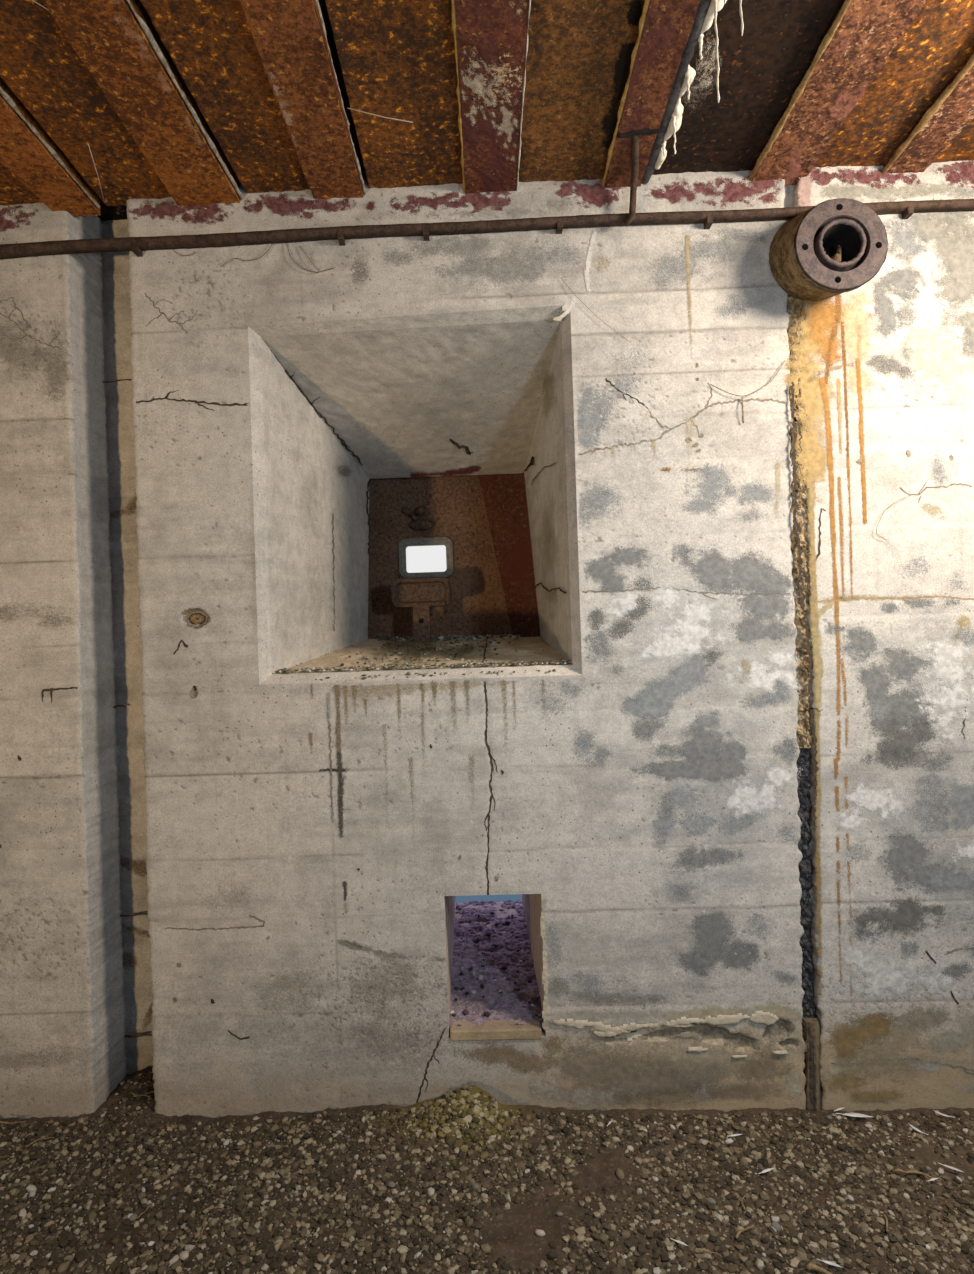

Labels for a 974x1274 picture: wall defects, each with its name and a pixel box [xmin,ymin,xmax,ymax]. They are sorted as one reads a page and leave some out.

efflorescence [701,0,724,35]
peeling [116,193,374,228]
peeling [390,191,521,217]
efflorescence [654,65,696,169]
peeling [644,160,974,209]
crack [136,390,248,411]
water stain [285,344,826,987]
crack [524,378,974,832]
corrosion [773,285,942,1000]
crack [482,637,498,895]
water stain [243,524,974,1110]
spalling [450,899,812,1067]